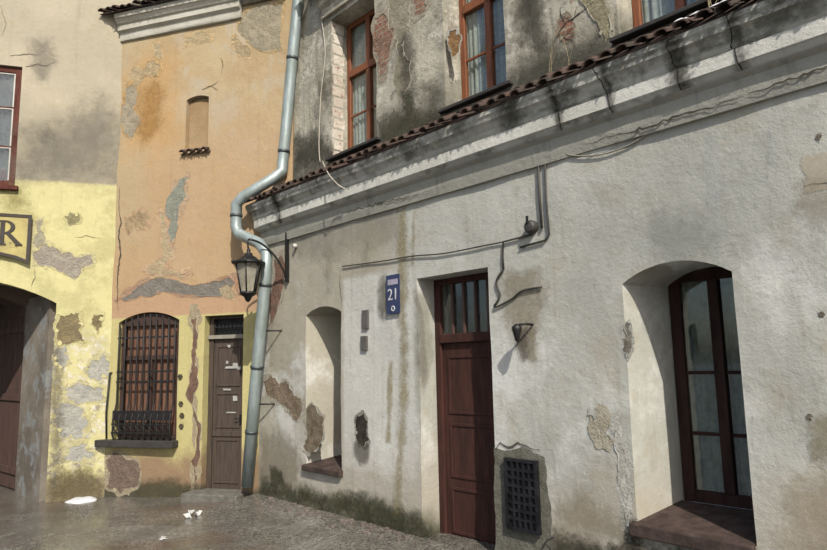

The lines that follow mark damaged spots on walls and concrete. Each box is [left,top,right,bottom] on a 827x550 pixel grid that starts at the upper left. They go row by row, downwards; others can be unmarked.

crack [666,38,681,90]
crack [726,14,742,70]
crack [585,66,827,145]
peeling [30,216,97,280]
crack [115,188,123,305]
leakage [378,283,386,317]
spalling [52,310,105,374]
flaking render [52,351,143,497]
flaking render [178,304,203,490]
flaking render [262,373,326,457]
spalling [354,410,371,448]
leakage [387,211,414,515]